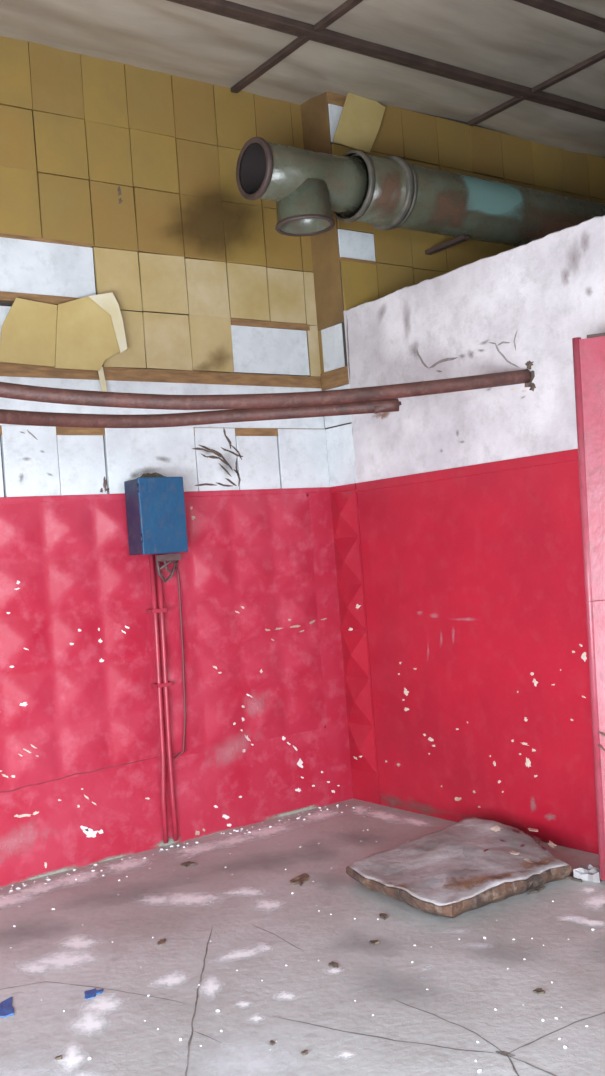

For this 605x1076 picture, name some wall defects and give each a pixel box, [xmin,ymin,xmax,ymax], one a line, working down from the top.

rust [374,176,401,212]
rust [527,211,586,239]
crack [417,350,458,372]
crack [488,332,519,368]
peeling [282,736,340,793]
crack [4,929,221,1076]
crack [274,1000,605,1076]